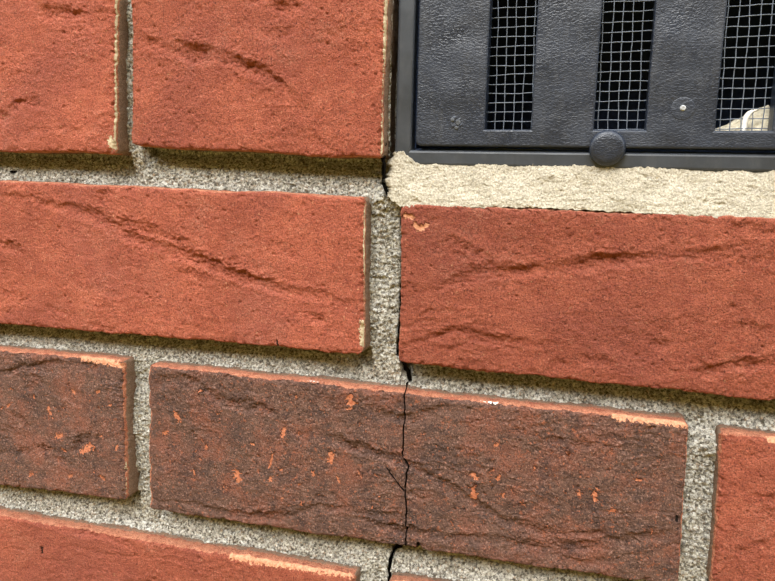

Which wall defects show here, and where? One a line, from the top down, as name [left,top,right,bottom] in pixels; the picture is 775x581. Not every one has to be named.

crack [381,143,390,199]
crack [387,284,412,581]